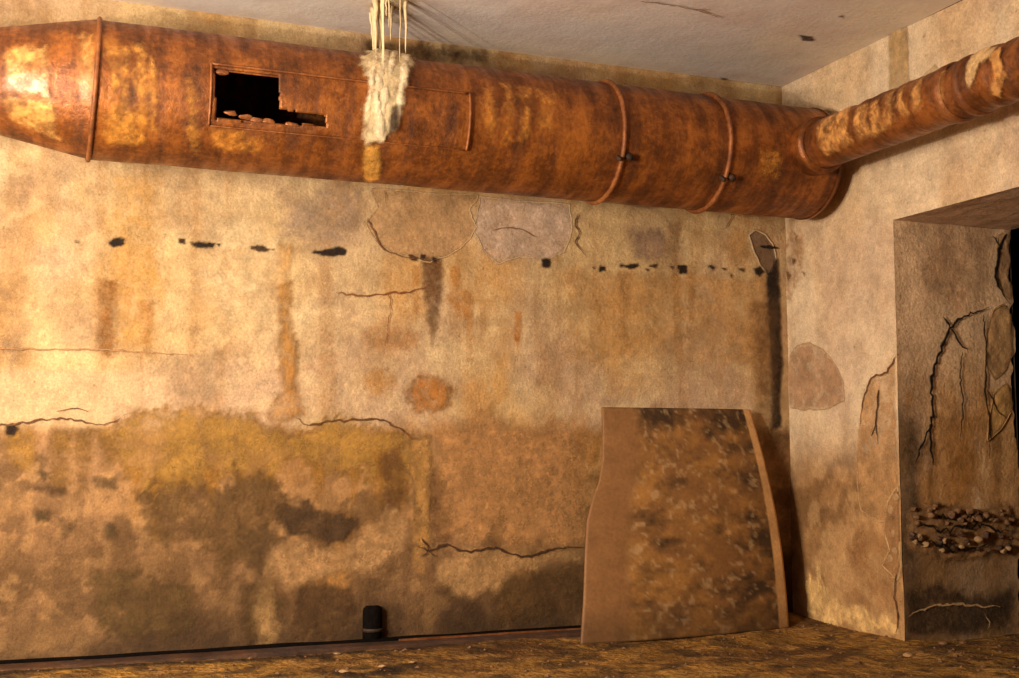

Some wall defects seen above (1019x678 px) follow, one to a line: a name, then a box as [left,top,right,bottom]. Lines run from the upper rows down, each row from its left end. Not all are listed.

rust [224,111,299,126]
rust [363,147,379,182]
crack [0,408,125,426]
water stain [98,284,587,577]
crack [297,418,412,440]
flaking render [787,343,845,410]
crack [859,356,896,442]
crack [915,233,1011,465]
spalling [856,364,1015,581]
crack [418,539,585,558]
water stain [240,585,352,637]
water stain [494,557,584,621]